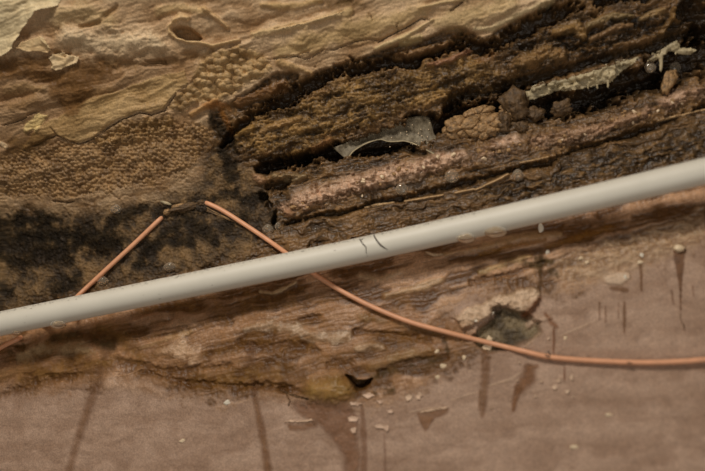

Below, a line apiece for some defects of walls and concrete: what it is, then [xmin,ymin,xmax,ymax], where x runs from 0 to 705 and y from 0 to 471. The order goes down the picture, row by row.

peeling [0,0,79,71]
crack [24,94,177,151]
peeling [23,71,188,151]
flaking render [208,0,705,214]
damp [134,113,267,269]
damp [0,203,179,270]
damp [522,251,553,318]
damp [671,250,685,310]
flaking render [454,287,550,353]
damp [479,350,489,416]
damp [512,365,538,411]
damp [288,400,366,471]